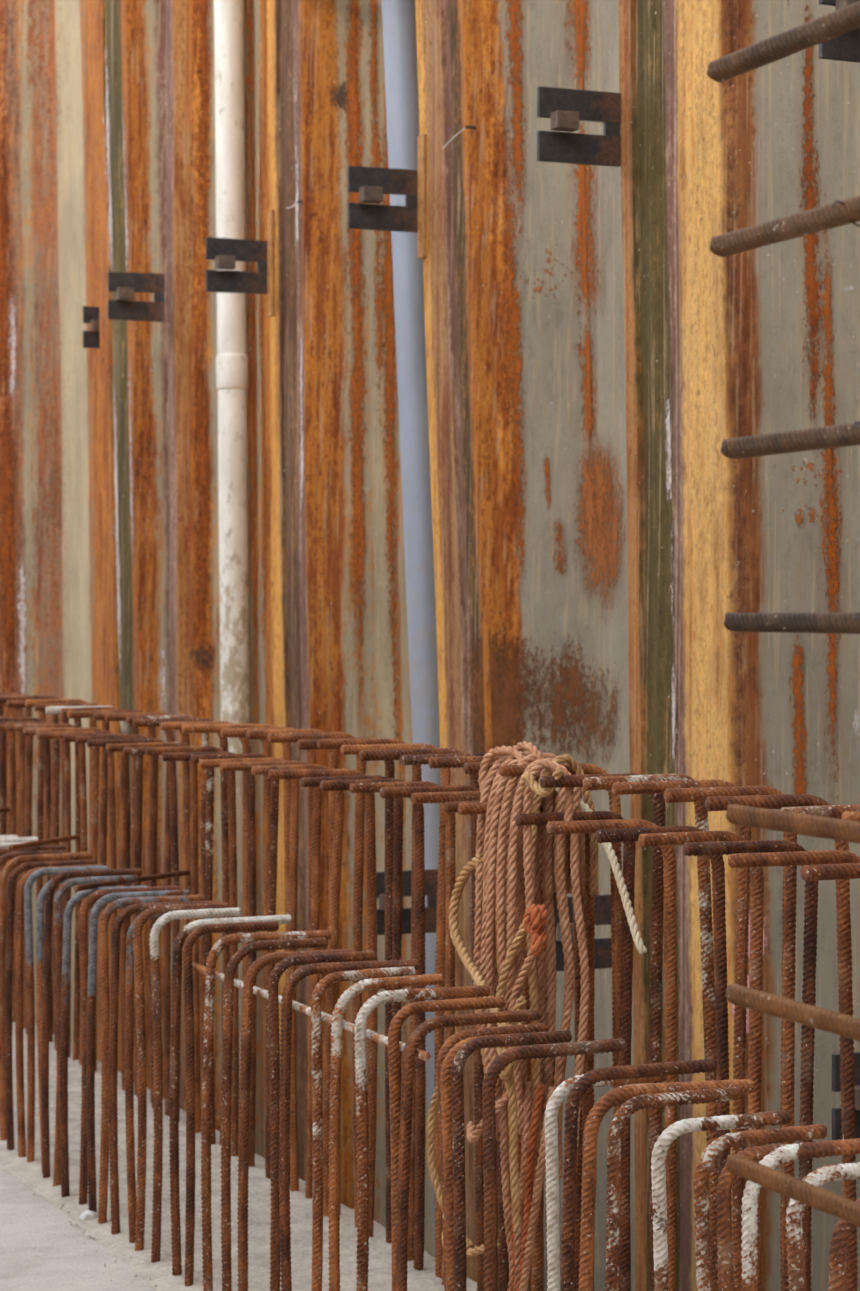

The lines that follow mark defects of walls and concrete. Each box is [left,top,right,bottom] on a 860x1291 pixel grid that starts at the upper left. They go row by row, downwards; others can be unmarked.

corrosion [193,0,213,238]
corrosion [347,192,364,204]
corrosion [343,0,388,168]
corrosion [796,46,826,211]
corrosion [0,140,78,683]
corrosion [193,355,212,670]
corrosion [345,225,399,737]
corrosion [502,0,626,623]
corrosion [774,448,843,613]
corrosion [801,230,836,426]
corrosion [789,633,841,794]